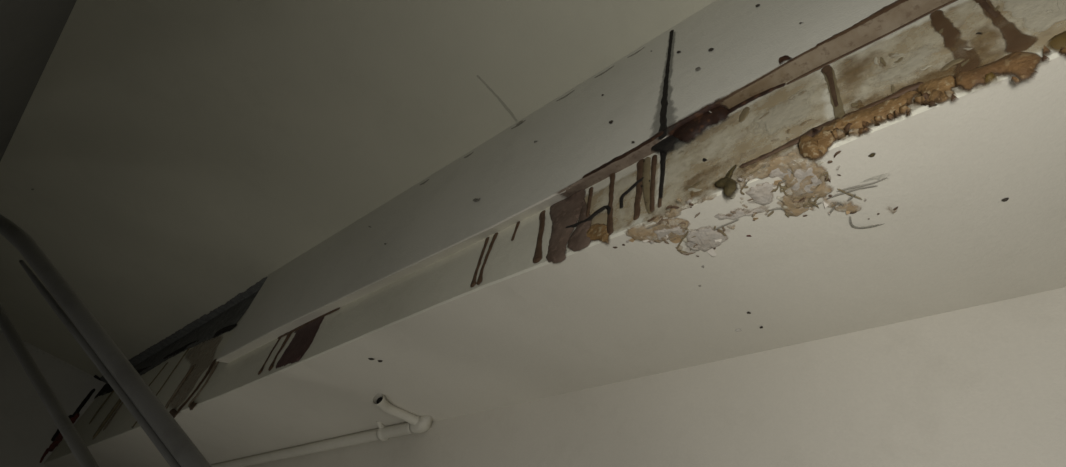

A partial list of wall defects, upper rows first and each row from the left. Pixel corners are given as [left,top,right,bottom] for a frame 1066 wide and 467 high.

crack [565,30,679,228]
rust [533,0,957,263]
rust [740,31,1066,168]
peeling [613,151,898,257]
rust [470,232,498,287]
spalling [129,277,267,376]
rust [258,307,340,375]